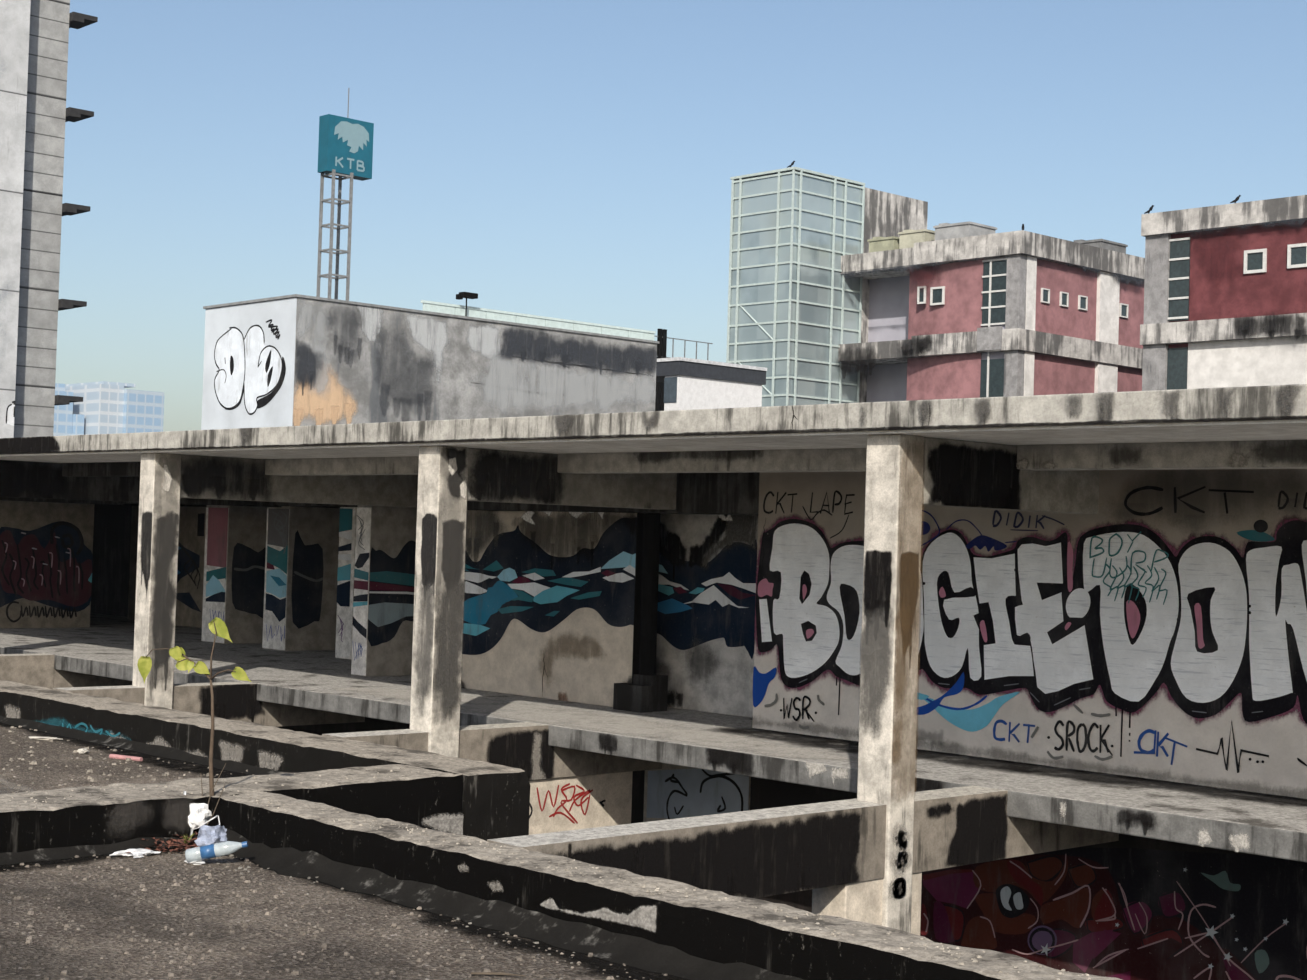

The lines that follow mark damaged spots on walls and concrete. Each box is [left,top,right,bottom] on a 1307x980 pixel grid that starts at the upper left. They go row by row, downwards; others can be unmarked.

damp [295,305,329,395]
damp [501,328,657,374]
damp [837,346,876,379]
damp [900,335,931,358]
damp [1235,314,1306,339]
damp [0,384,1307,783]
damp [915,749,1307,806]
spalling [540,899,657,932]